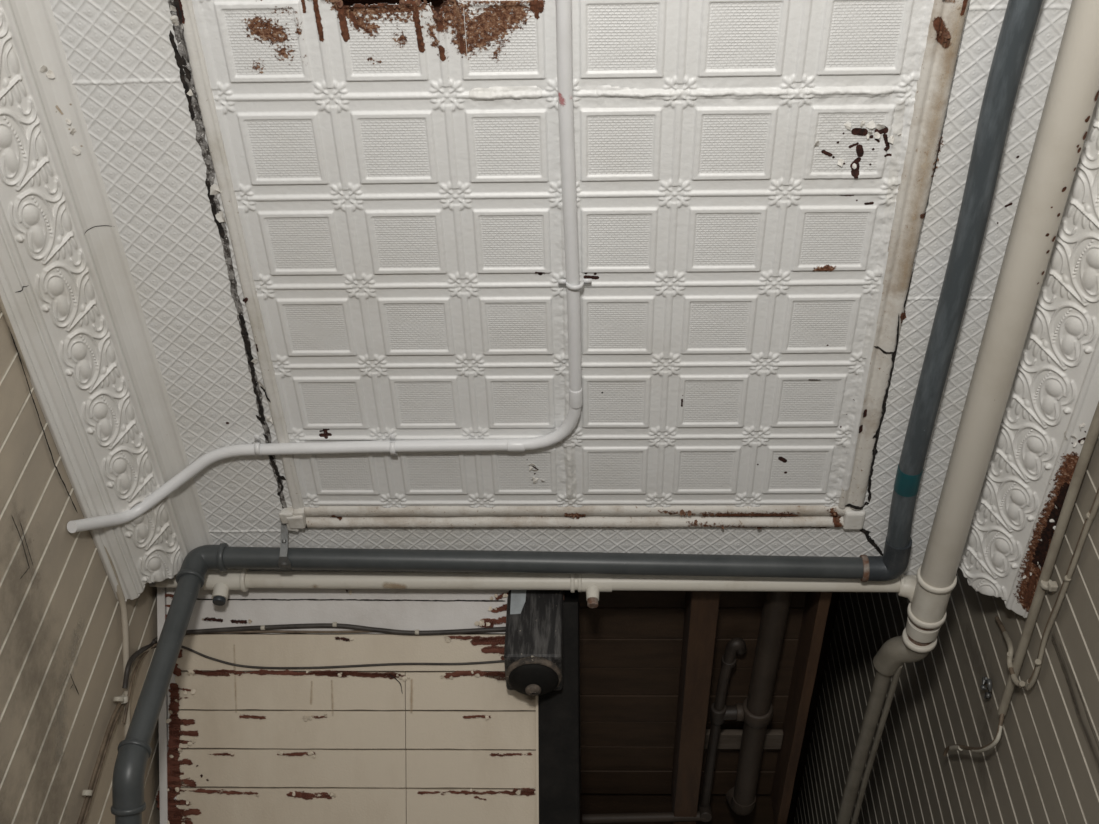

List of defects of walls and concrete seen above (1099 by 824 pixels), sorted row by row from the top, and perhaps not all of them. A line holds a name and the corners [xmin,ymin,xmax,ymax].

rust [244,0,545,65]
rust [933,16,951,49]
crack [168,0,308,529]
crack [845,2,970,556]
rust [1013,451,1089,612]
peeling [440,592,508,680]
peeling [155,649,410,824]
peeling [418,787,536,800]